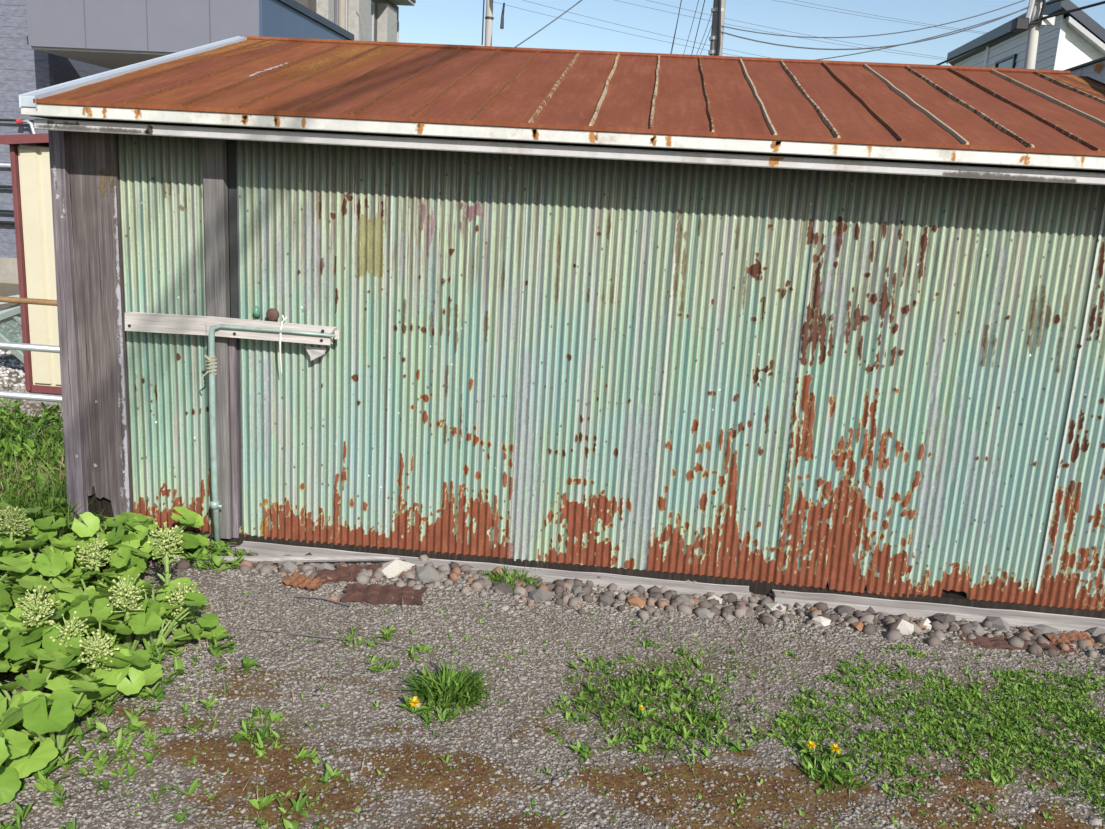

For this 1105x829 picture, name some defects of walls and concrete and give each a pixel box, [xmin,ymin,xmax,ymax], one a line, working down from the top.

corrosion [82,40,277,87]
corrosion [286,45,394,76]
corrosion [650,135,672,146]
peeling [418,202,434,257]
peeling [459,201,483,230]
corrosion [393,296,458,352]
corrosion [537,210,1105,611]
corrosion [239,365,515,559]